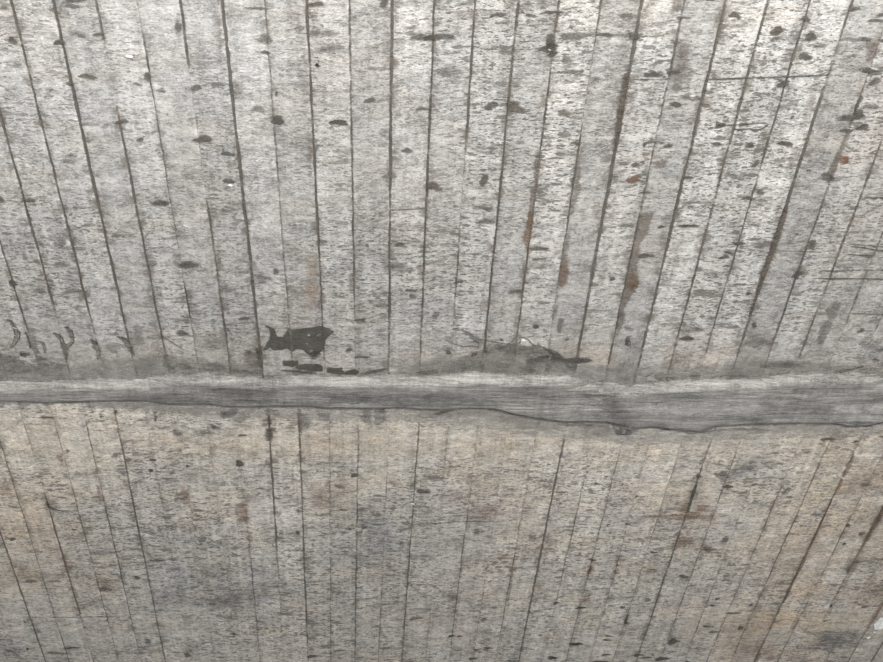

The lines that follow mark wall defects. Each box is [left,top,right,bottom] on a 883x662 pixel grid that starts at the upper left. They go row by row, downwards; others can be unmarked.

damp [0,319,75,373]
damp [230,348,263,374]